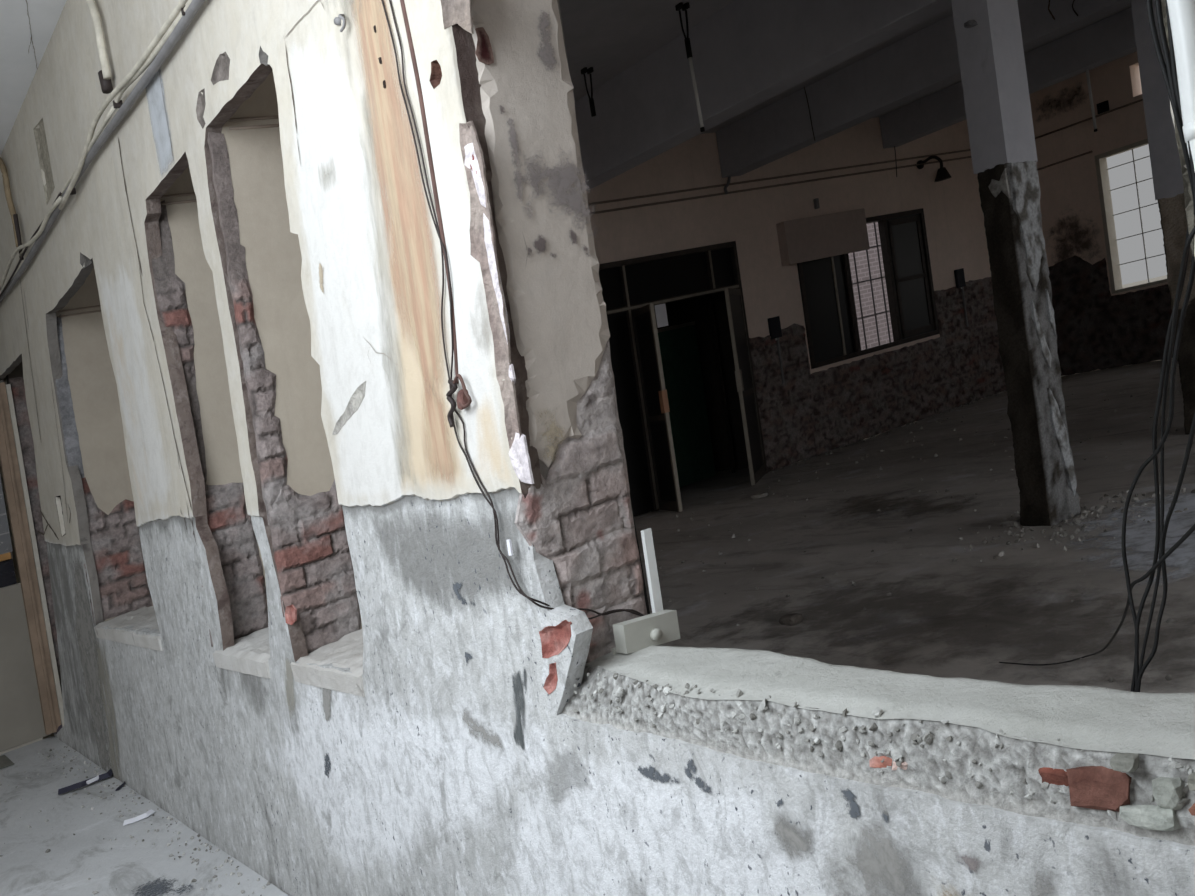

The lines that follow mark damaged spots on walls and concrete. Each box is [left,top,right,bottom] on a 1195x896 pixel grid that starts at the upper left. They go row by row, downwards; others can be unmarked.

spalling [441,0,494,65]
peeling [538,11,556,70]
peeling [500,106,523,199]
spalling [80,253,93,269]
corrosion [353,0,454,479]
spalling [988,161,1175,376]
spalling [152,52,366,654]
spalling [55,314,153,624]
spalling [459,121,647,694]
peeling [1047,388,1077,496]
peeling [841,789,861,820]